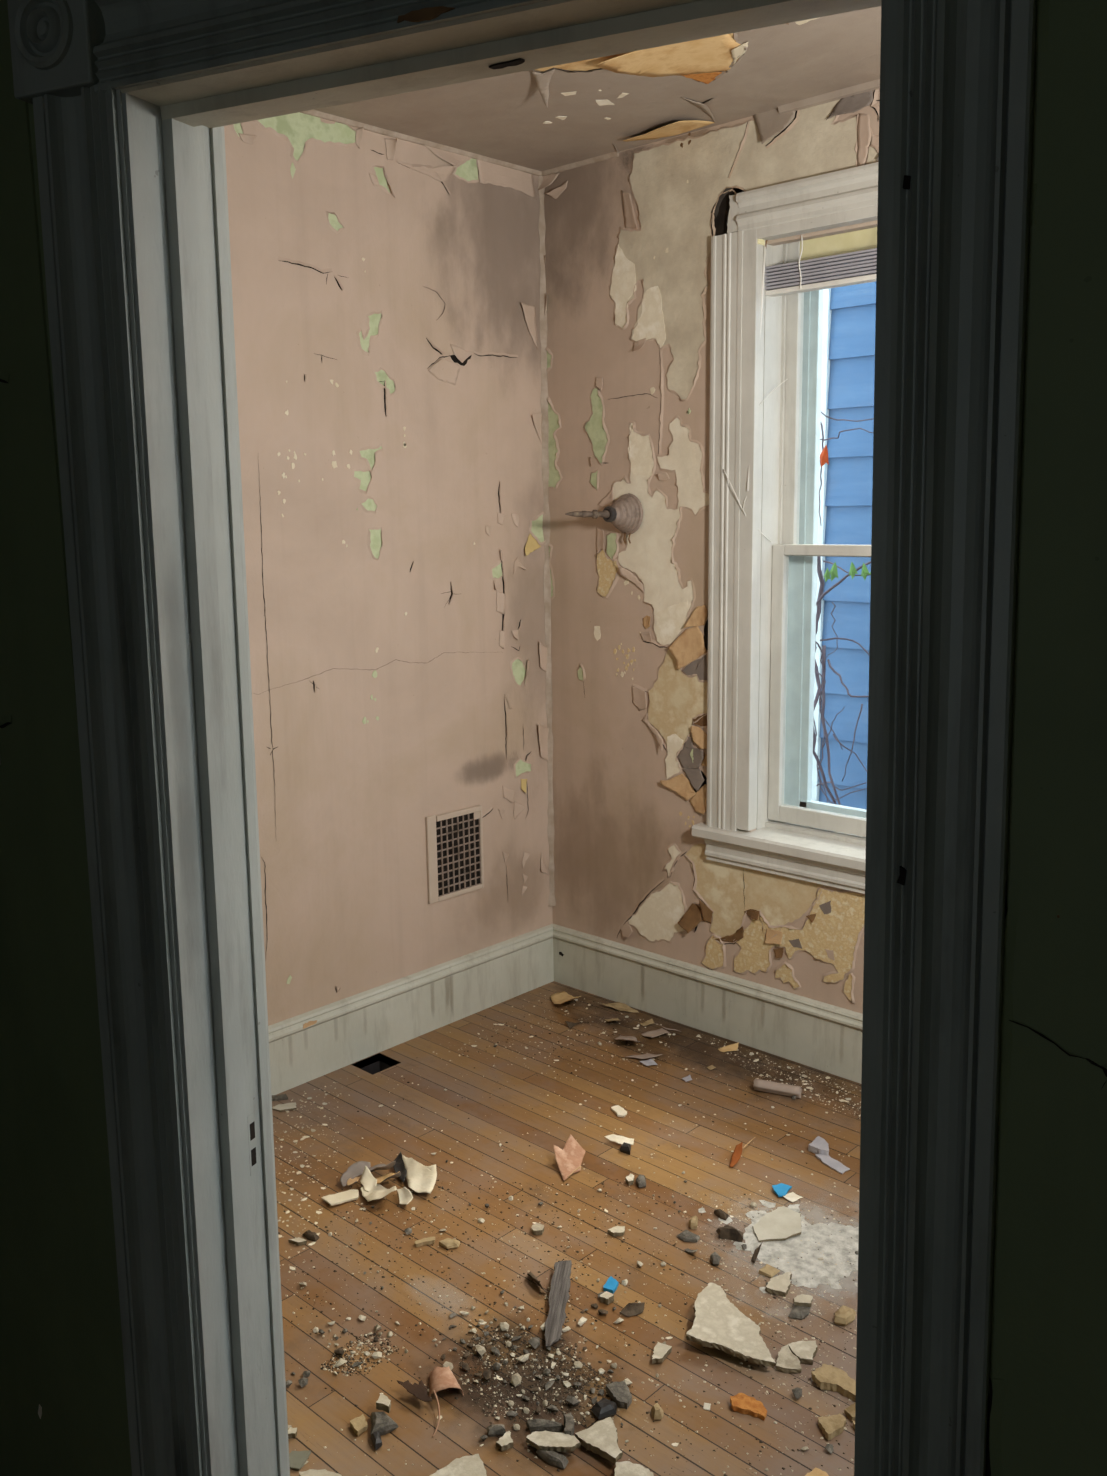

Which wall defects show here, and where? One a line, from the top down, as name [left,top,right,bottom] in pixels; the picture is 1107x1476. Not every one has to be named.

peeling [489,58,603,124]
crack [278,257,347,290]
peeling [231,112,568,907]
flaking render [583,89,880,780]
crack [253,463,484,950]
flaking render [615,812,865,1004]
crack [1009,1020,1107,1088]